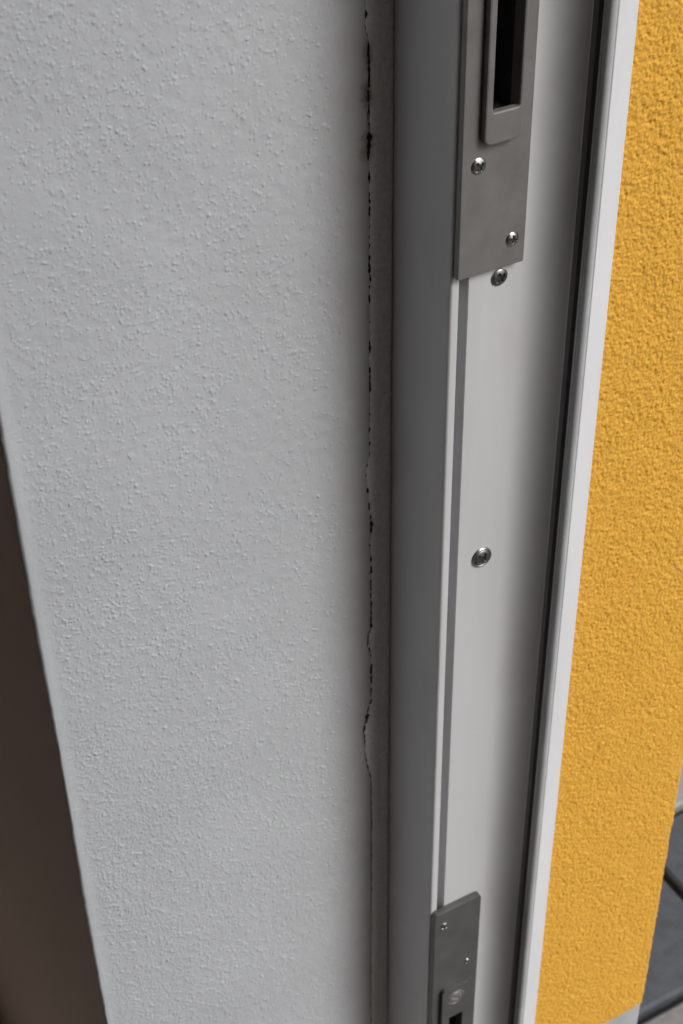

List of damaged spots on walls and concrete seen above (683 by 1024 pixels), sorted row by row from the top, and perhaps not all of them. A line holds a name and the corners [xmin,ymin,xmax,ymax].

crack [363,2,374,974]